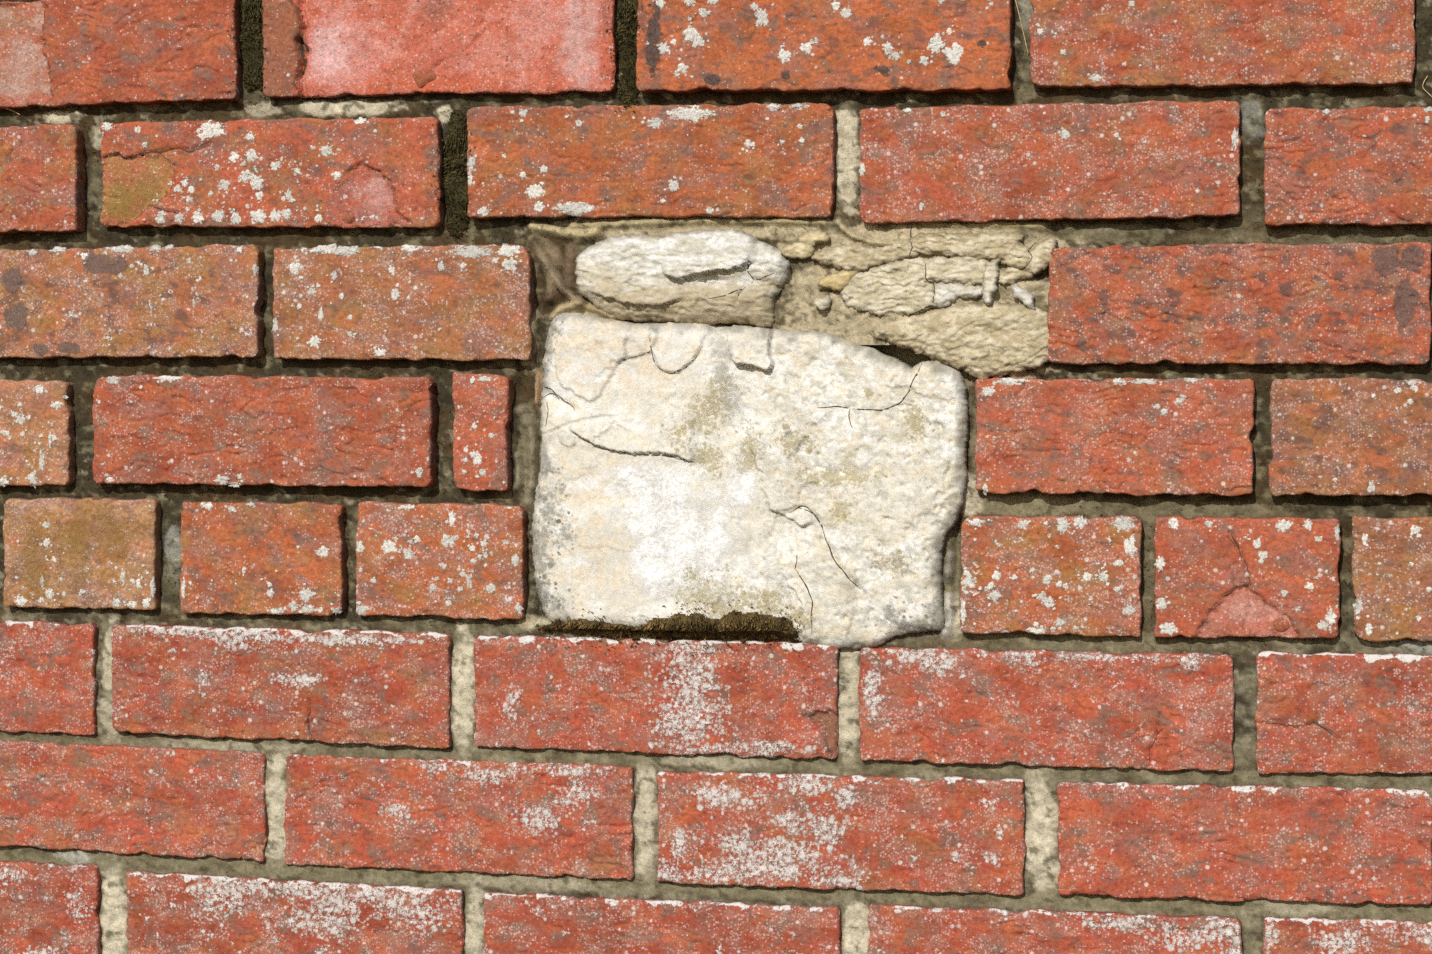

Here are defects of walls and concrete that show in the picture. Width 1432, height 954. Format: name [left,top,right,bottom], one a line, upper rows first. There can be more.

crack [621,346,703,374]
crack [544,387,695,463]
crack [817,363,923,428]
crack [789,505,860,634]
crack [1222,532,1251,597]